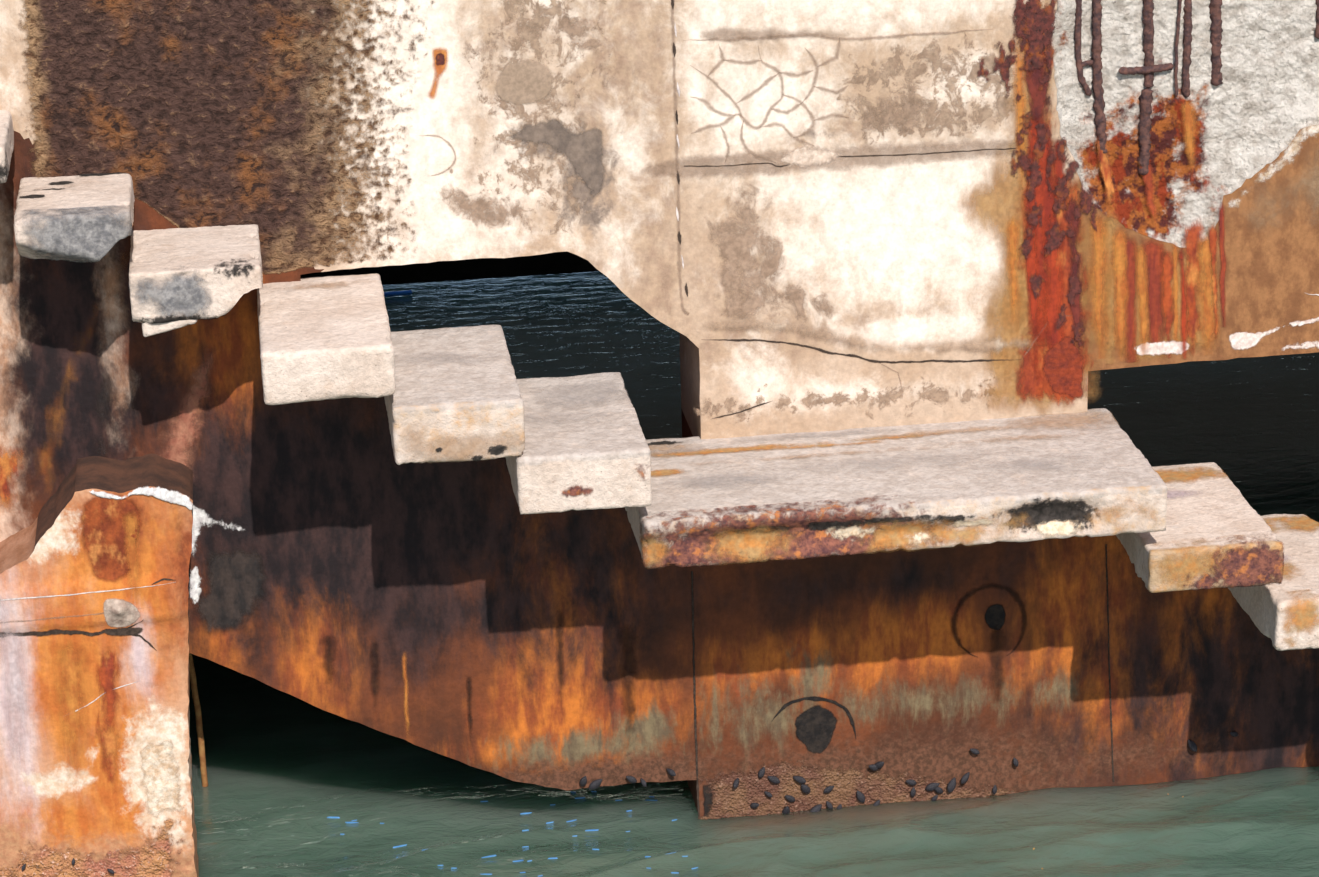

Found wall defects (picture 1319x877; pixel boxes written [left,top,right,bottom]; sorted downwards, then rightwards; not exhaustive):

corrosion [430,49,447,98]
crack [671,0,1055,297]
spalling [1051,0,1319,248]
corrosion [638,0,1226,478]
crack [702,339,1021,363]
crack [712,401,771,419]
corrosion [563,486,593,497]
corrosion [82,495,141,588]
corrosion [716,527,788,562]
corrosion [1164,516,1319,591]
crack [0,578,174,601]
crack [0,620,157,651]